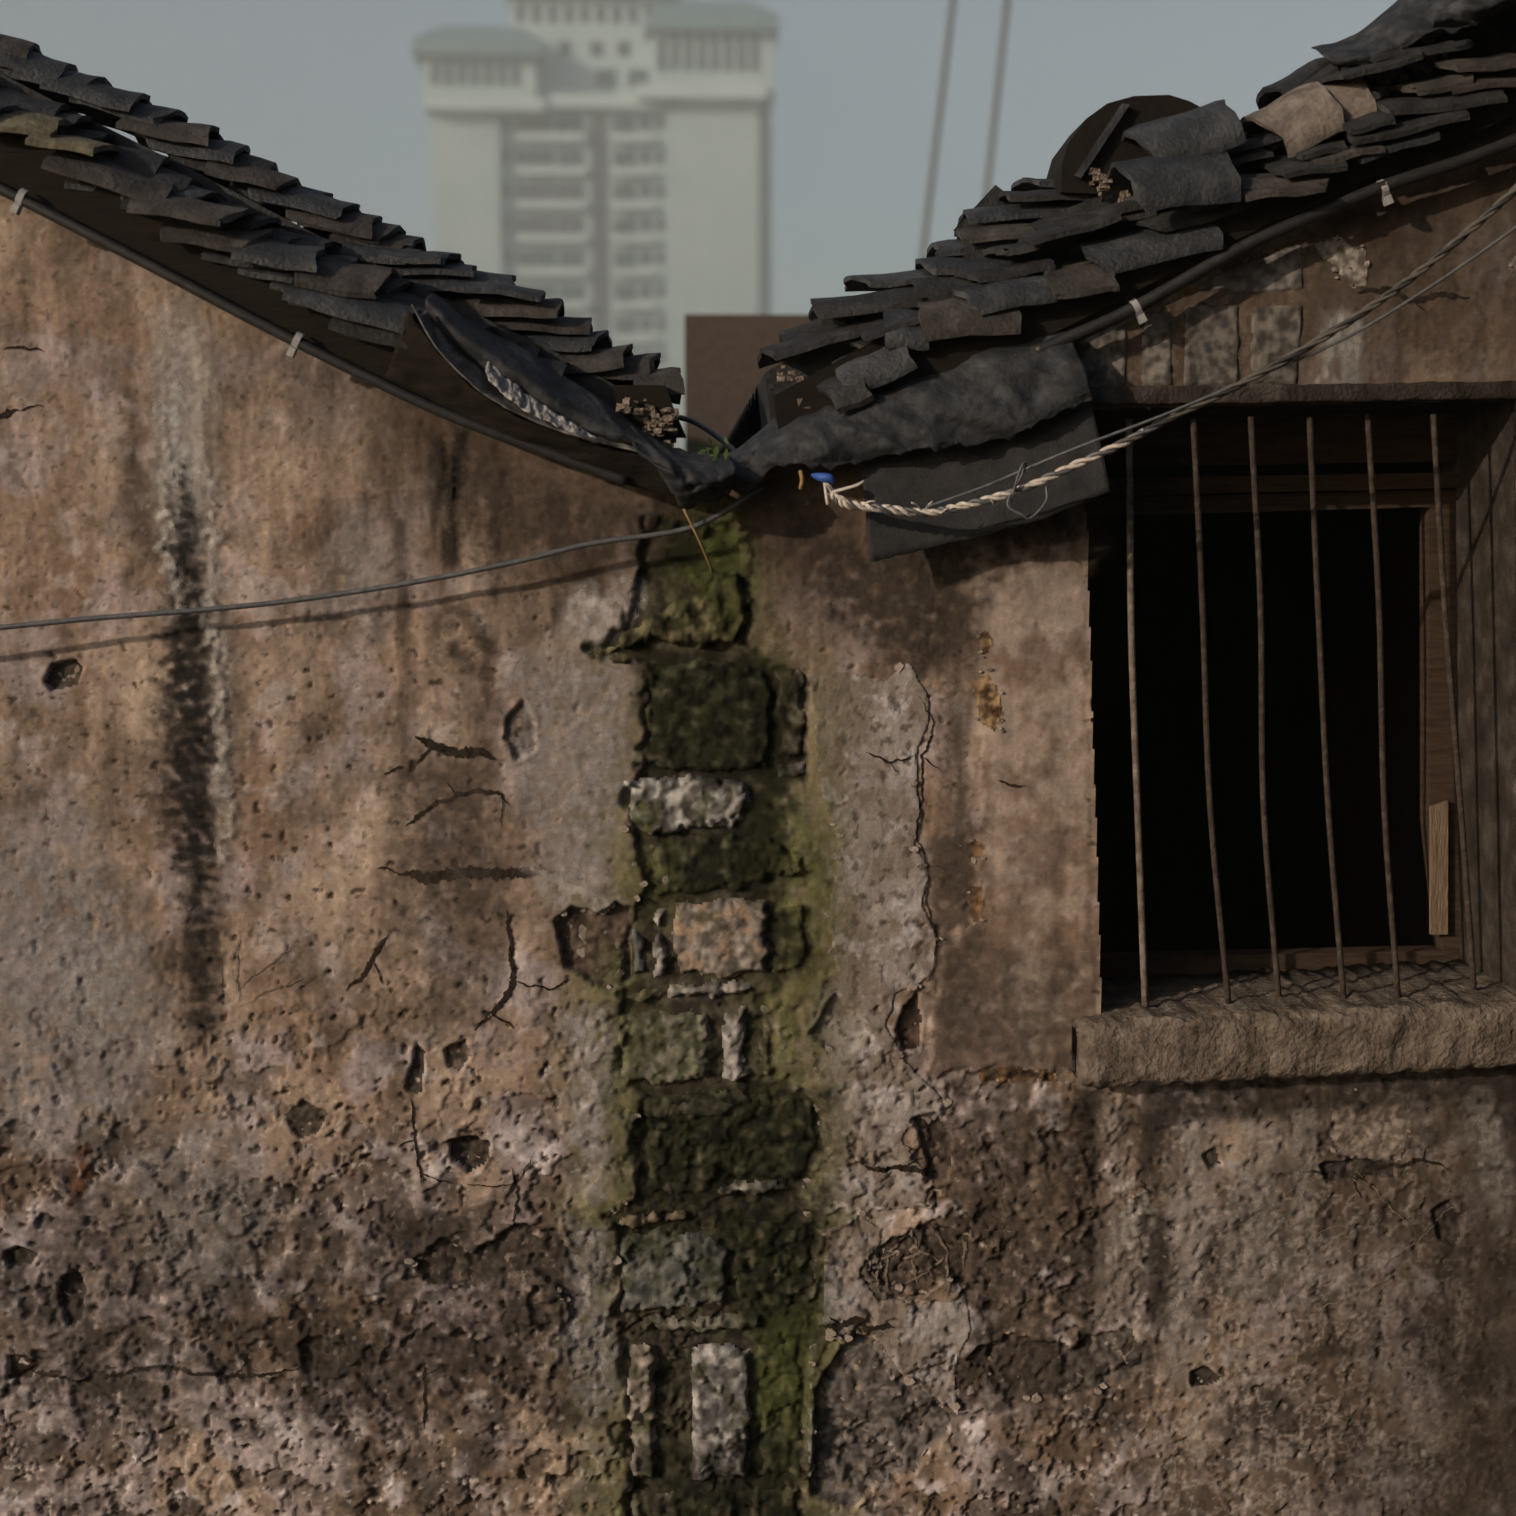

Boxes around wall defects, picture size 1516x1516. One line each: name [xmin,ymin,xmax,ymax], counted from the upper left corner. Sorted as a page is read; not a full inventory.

crack [0,405,42,419]
crack [2,344,43,352]
damp [151,305,233,1025]
crack [383,736,510,828]
crack [865,696,946,975]
crack [346,934,389,991]
crack [377,863,586,1031]
flaking render [556,570,1154,1516]